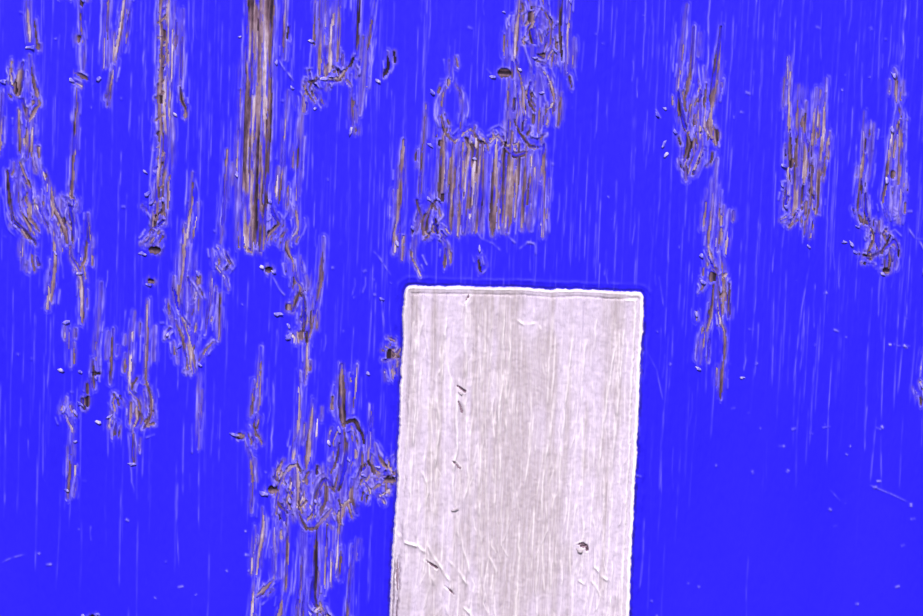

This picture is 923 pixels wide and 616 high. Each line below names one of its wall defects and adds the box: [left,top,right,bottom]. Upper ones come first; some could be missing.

peeling [0,0,130,417]
peeling [95,300,155,466]
peeling [173,20,187,118]
peeling [166,182,231,374]
peeling [221,0,396,616]
peeling [382,338,401,379]
peeling [392,0,573,276]
peeling [655,26,723,181]
peeling [780,56,830,249]
peeling [841,72,908,276]